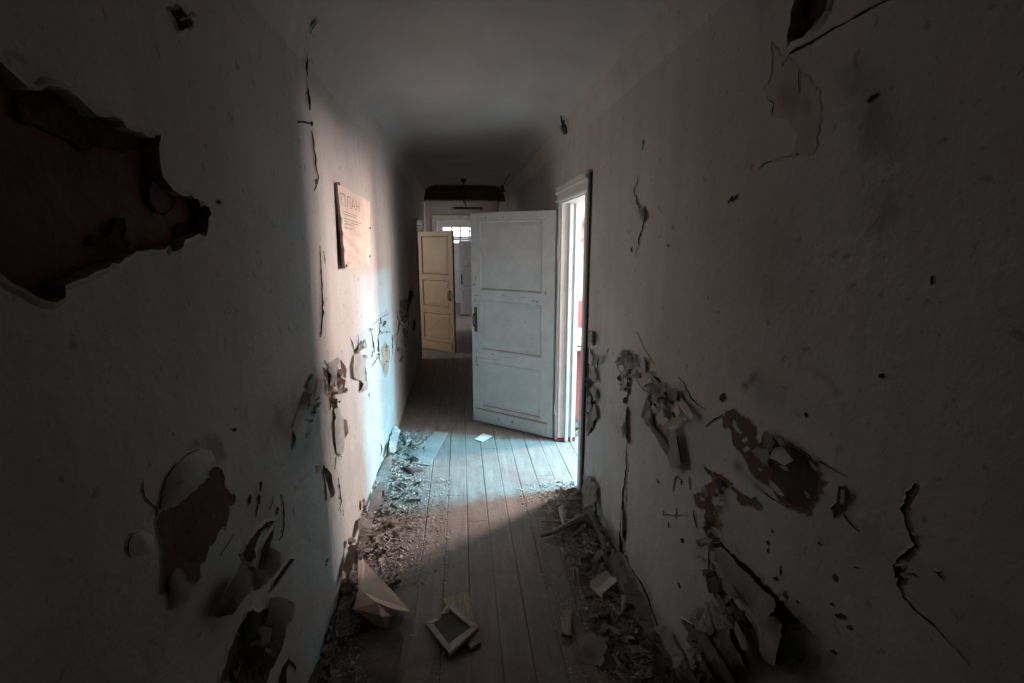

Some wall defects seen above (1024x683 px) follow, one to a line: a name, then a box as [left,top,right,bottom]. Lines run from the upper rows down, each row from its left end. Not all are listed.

flaking render [786,0,834,53]
flaking render [0,57,221,310]
peeling [290,290,416,502]
peeling [153,464,297,683]
peeling [583,329,862,683]
crack [892,482,972,668]